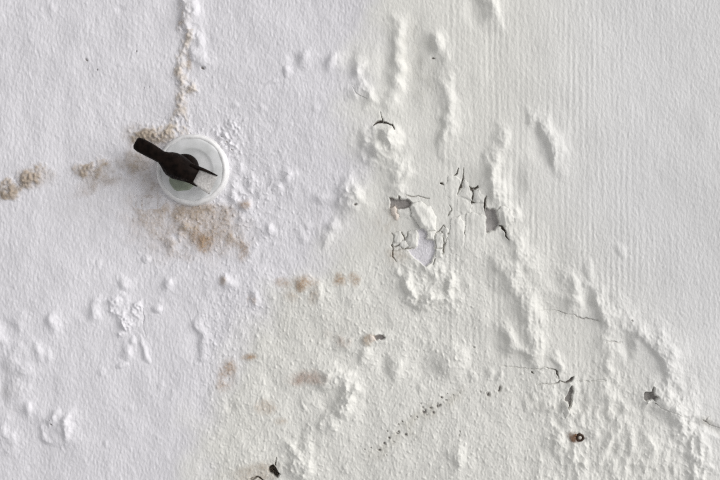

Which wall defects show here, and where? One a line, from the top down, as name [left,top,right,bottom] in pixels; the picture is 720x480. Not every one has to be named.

crack [373,112,395,130]
peeling [389,175,514,267]
crack [500,365,606,385]
peeling [561,386,574,419]
peeling [644,387,660,404]